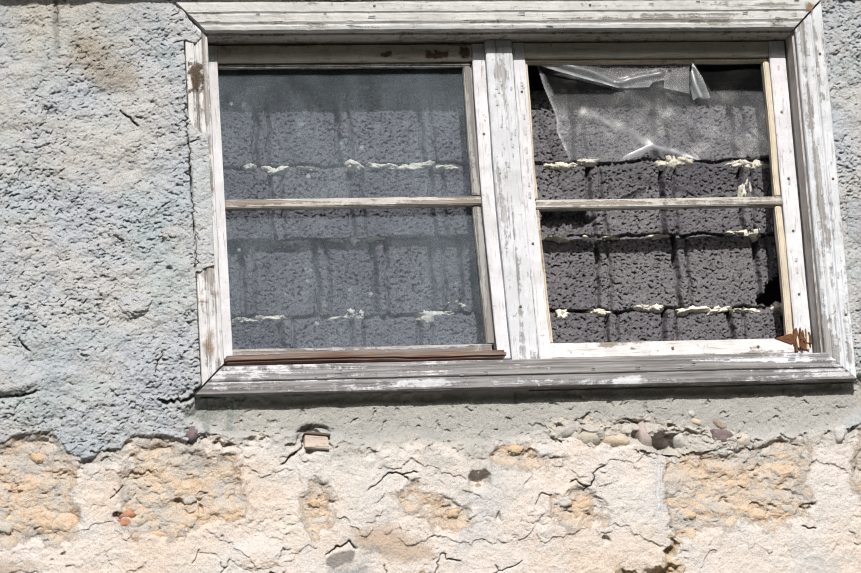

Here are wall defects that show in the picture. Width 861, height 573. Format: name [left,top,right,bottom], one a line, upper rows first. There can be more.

crack [184,104,200,269]
spalling [0,435,80,549]
spalling [114,440,255,542]
spalling [298,477,337,541]
spalling [391,481,472,532]
spalling [489,444,569,471]
spalling [546,412,813,573]
spalling [850,428,861,500]